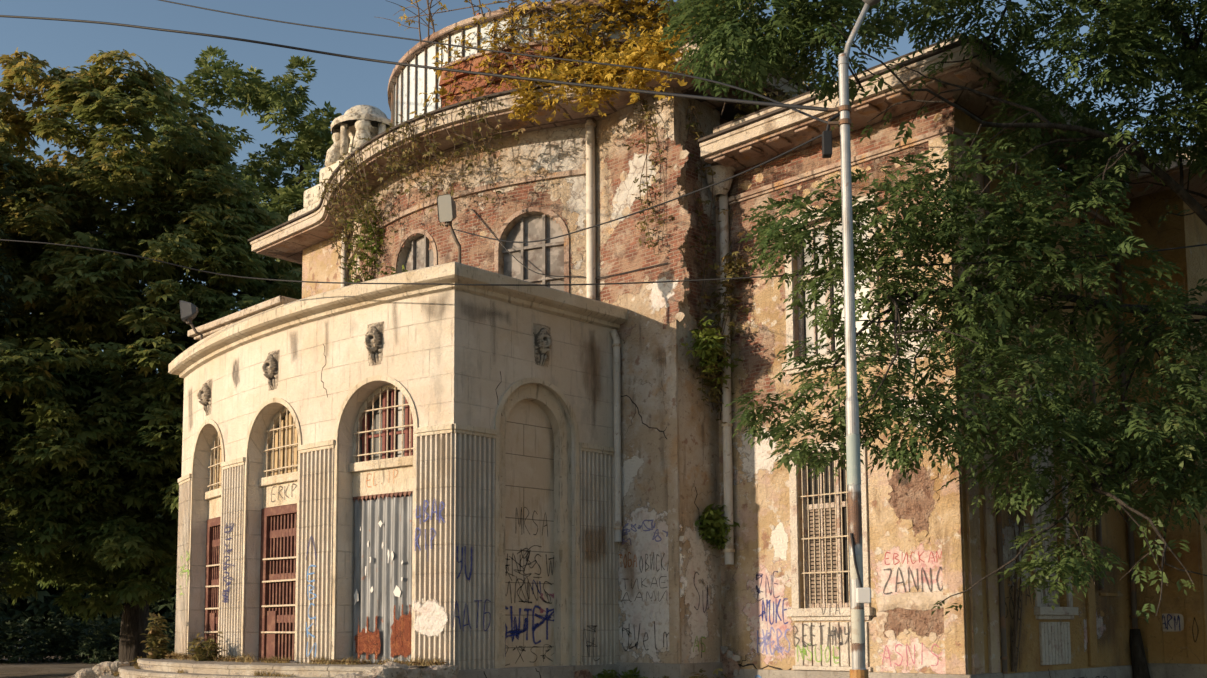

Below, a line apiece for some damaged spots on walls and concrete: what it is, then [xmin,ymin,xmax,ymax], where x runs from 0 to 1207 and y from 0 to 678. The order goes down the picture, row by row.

flaking render [359,97,955,490]
crack [621,395,667,439]
rust [354,604,412,660]
peeling [618,454,715,663]
peeling [742,519,795,665]
flaking render [871,462,946,674]